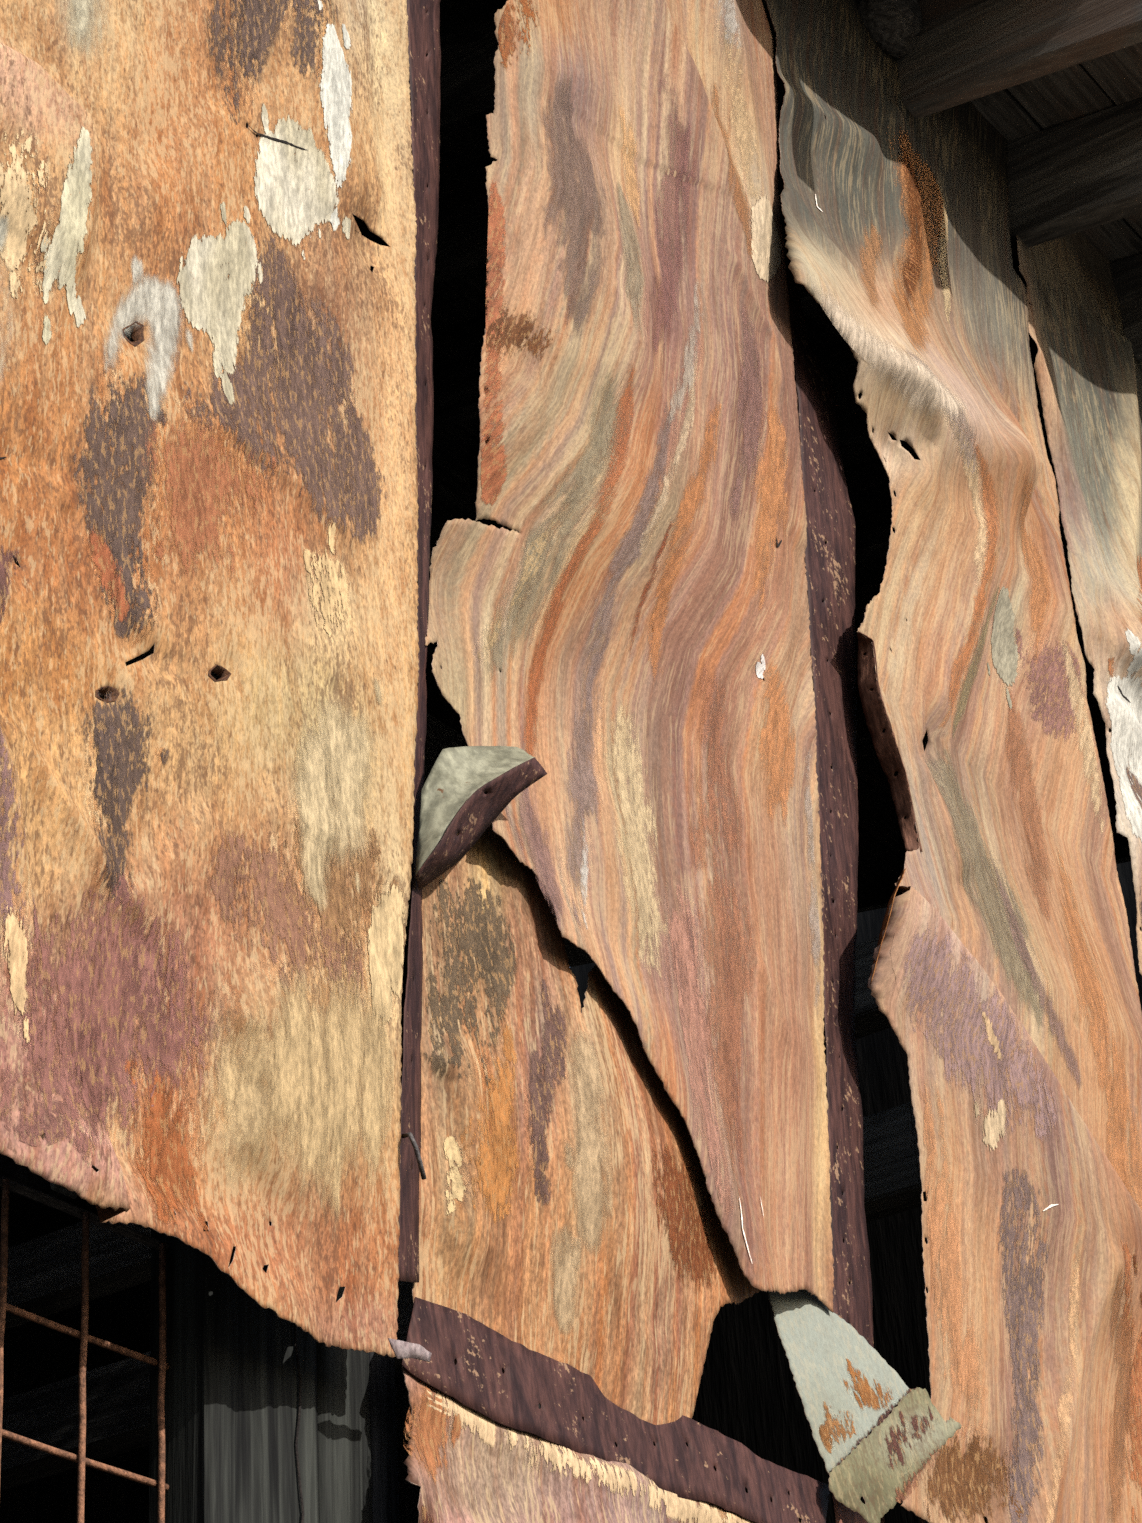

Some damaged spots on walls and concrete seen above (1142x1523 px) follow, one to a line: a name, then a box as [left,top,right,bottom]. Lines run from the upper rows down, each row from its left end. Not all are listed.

peeling [0,126,93,345]
rust [74,235,386,638]
peeling [177,0,353,405]
rust [207,0,340,125]
rust [481,181,553,505]
peeling [1105,627,1142,841]
peeling [4,906,30,1043]
rust [0,687,232,1230]
peeling [444,1136,466,1216]
rust [424,878,567,1222]
rust [652,667,753,1289]
rust [819,1093,1049,1523]